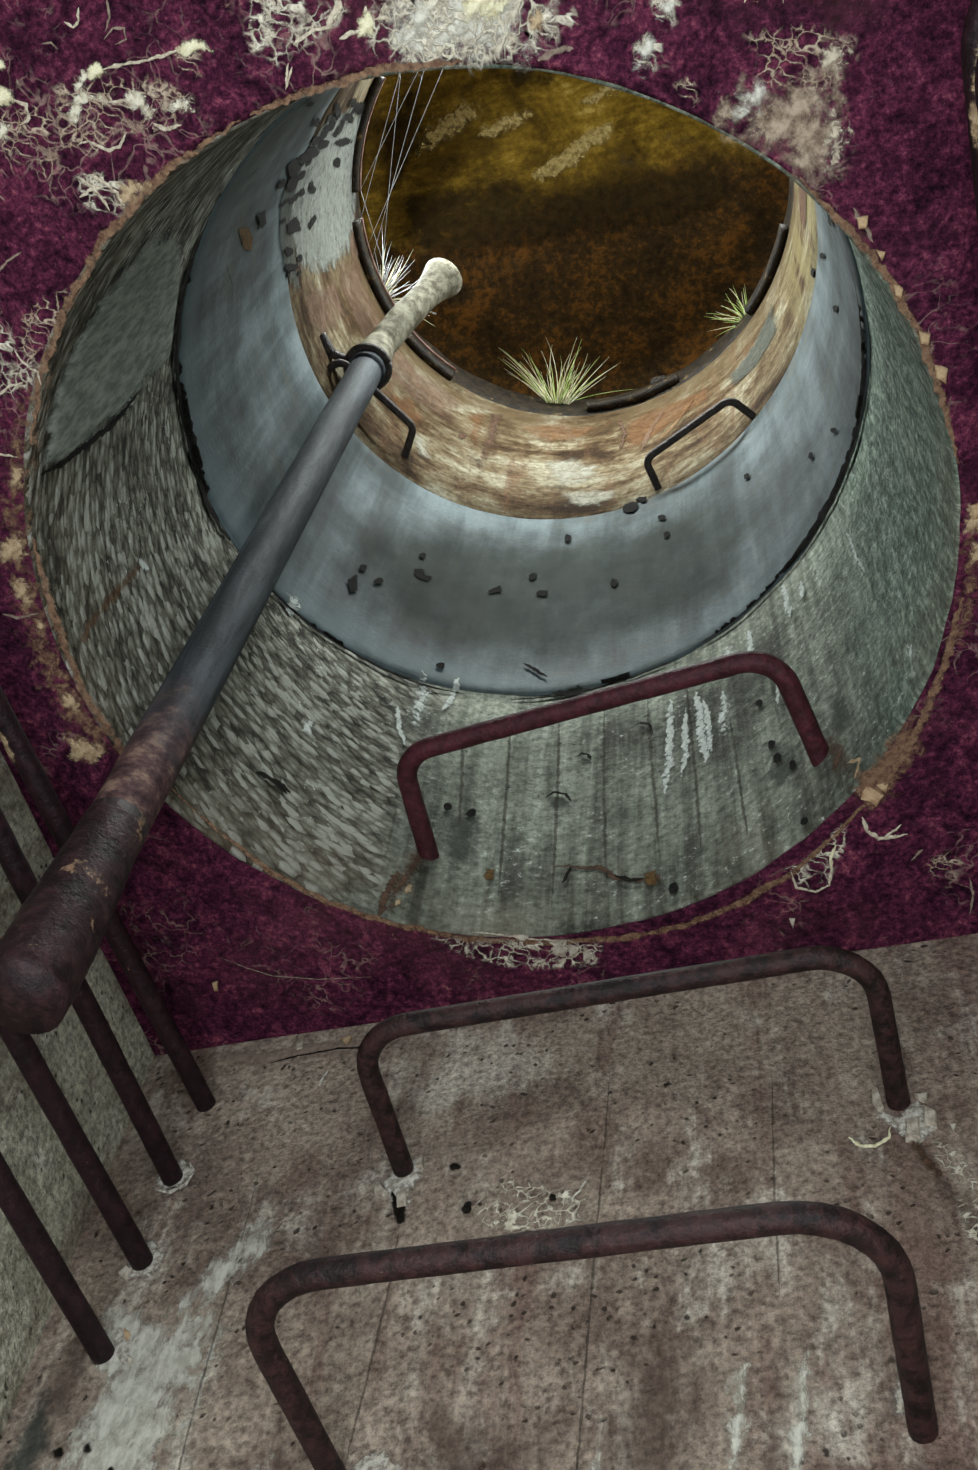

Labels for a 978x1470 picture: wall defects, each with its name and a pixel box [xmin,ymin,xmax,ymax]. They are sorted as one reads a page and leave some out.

rust [510,70,552,88]
peeling [238,98,366,288]
rust [0,59,463,763]
rust [730,307,777,383]
rust [799,177,959,464]
leakage [661,691,730,794]
leakage [722,630,754,656]
leakage [780,581,805,617]
rust [884,598,964,785]
rust [171,788,866,946]